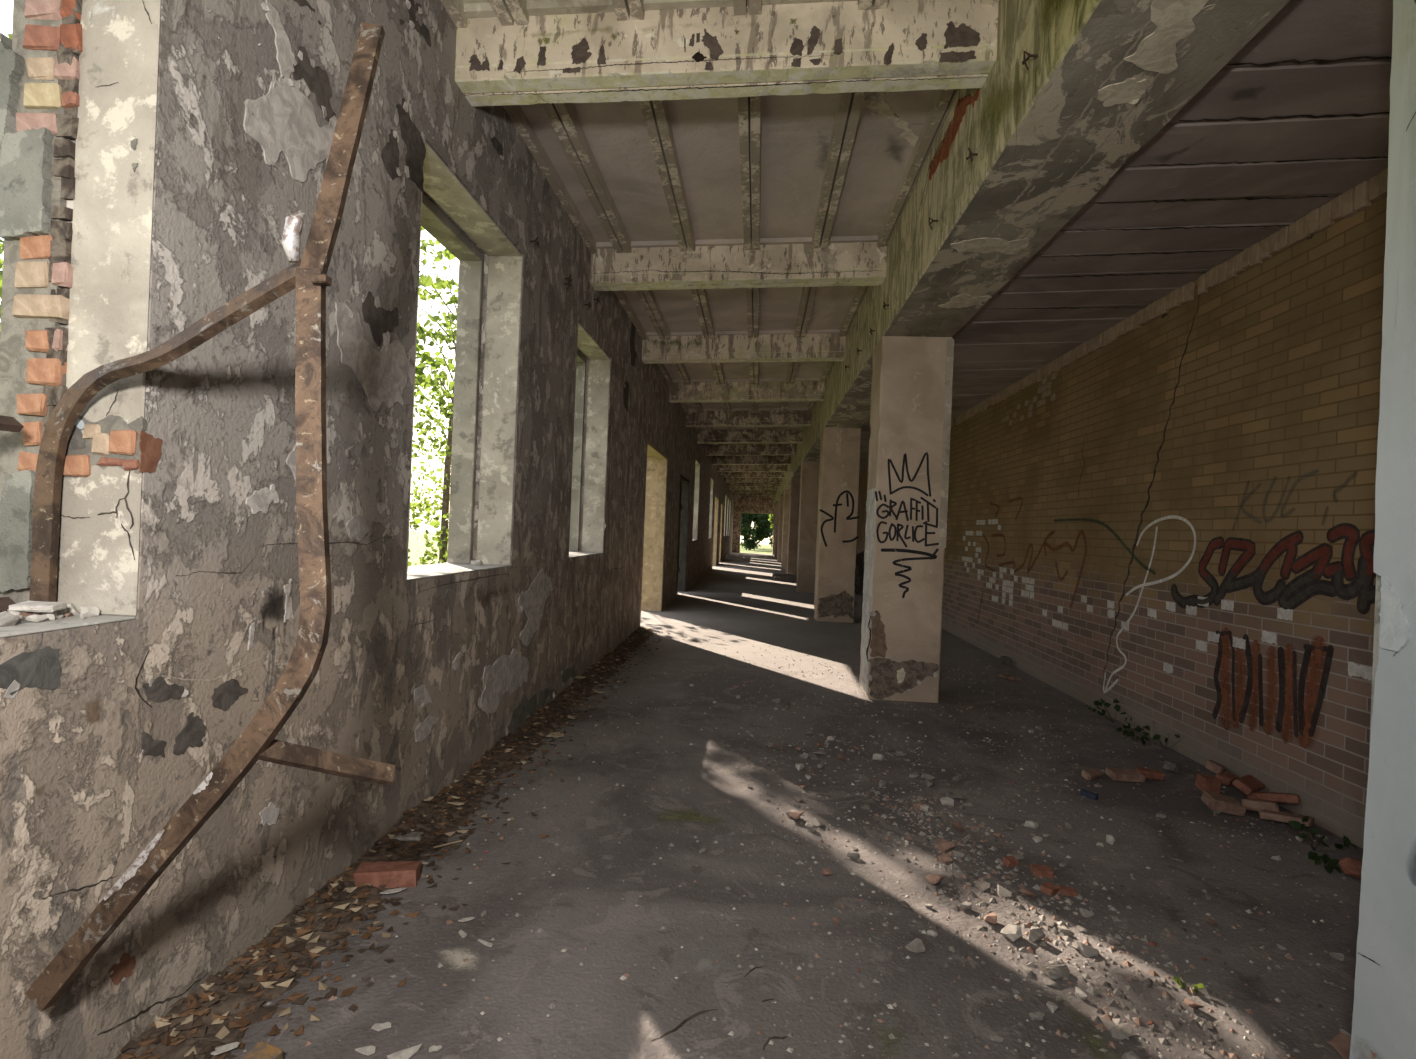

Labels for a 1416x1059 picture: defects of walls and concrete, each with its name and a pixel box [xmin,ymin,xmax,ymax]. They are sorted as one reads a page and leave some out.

damp [883,43,922,76]
damp [915,21,981,73]
flaking render [0,0,83,604]
crack [62,470,135,560]
crack [1101,295,1200,690]
flaking render [0,646,62,699]
peeling [140,676,206,758]
peeling [211,679,248,711]
flaking render [818,591,939,700]